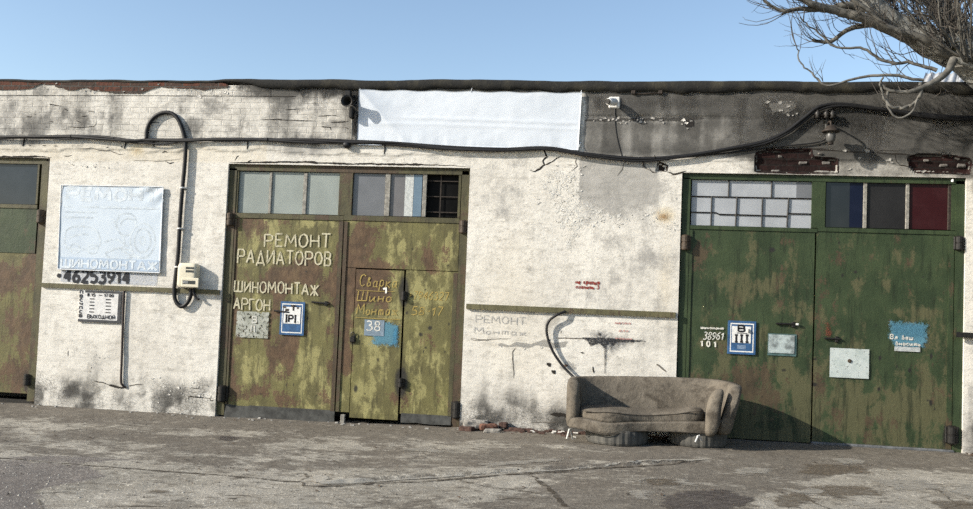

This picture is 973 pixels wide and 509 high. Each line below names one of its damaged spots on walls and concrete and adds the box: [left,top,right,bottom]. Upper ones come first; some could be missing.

damp [297,88,357,135]
crack [0,457,702,509]